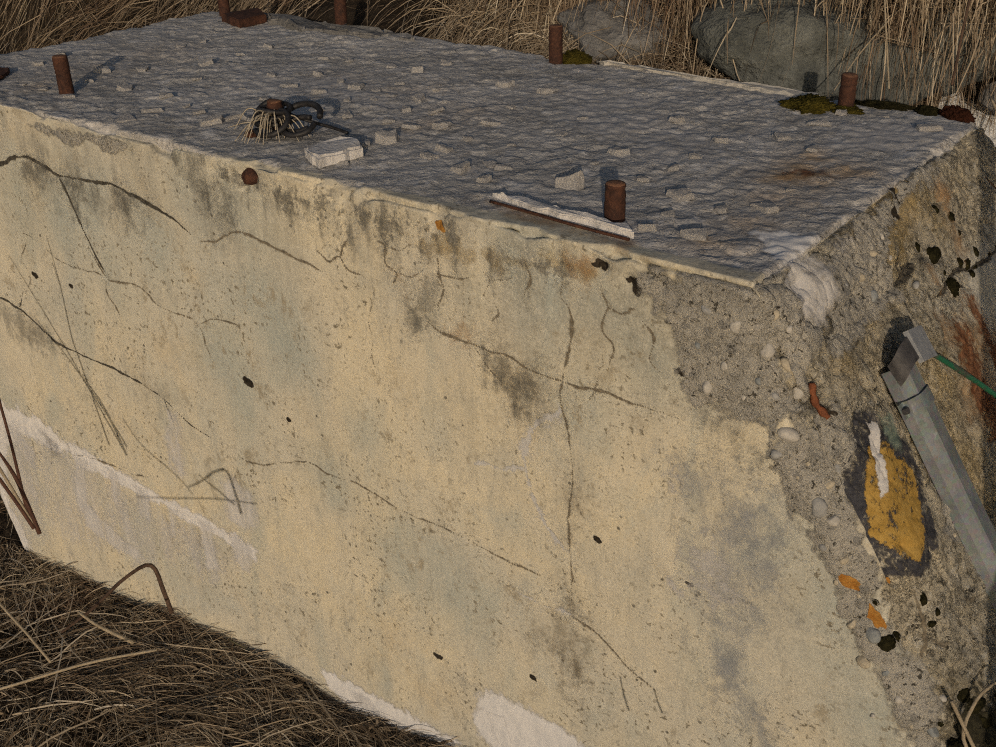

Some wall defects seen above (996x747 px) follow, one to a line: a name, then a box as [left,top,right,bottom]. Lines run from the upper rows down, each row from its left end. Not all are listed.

spalling [607,147,630,156]
crack [0,155,363,437]
crack [249,241,678,692]
spalling [637,156,947,747]
rust [950,295,996,441]